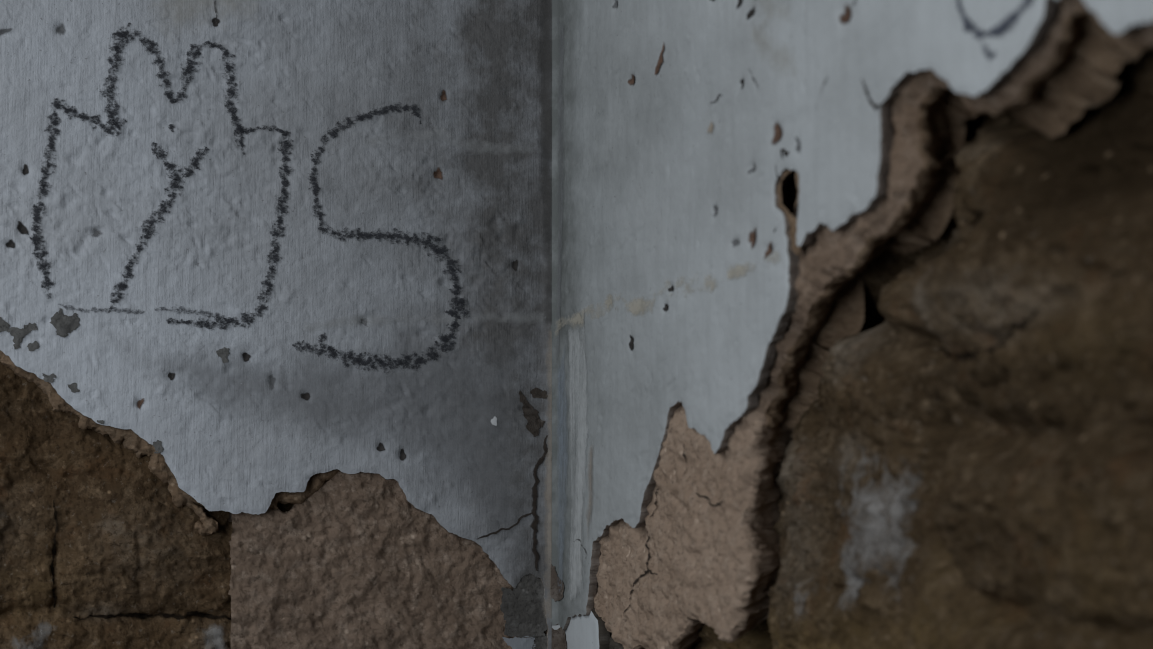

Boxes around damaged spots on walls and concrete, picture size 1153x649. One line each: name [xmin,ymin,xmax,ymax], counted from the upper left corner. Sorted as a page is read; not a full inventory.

peeling [6,221,28,248]
peeling [0,317,39,351]
peeling [50,308,80,337]
spalling [550,0,1153,649]
peeling [216,347,250,363]
spalling [0,351,548,649]
leakage [842,479,914,598]